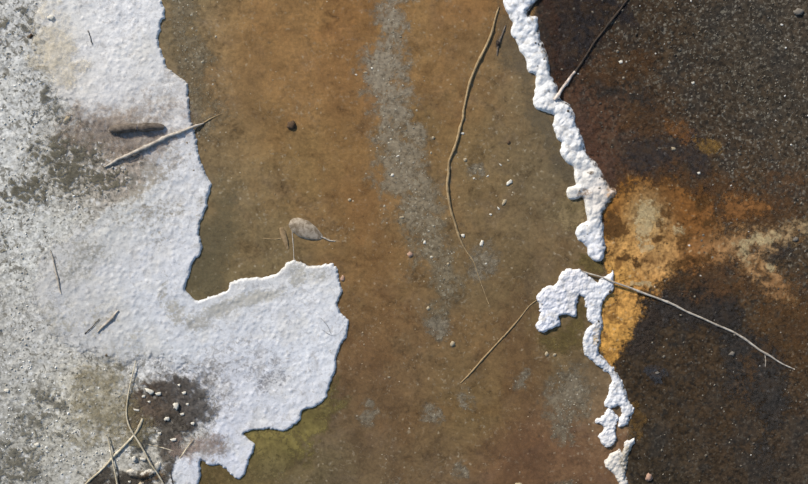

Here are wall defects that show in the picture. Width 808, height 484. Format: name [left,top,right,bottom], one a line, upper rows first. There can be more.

spalling [162,0,223,151]
damp [28,0,639,484]
spalling [353,0,500,342]
corrosion [599,174,808,366]